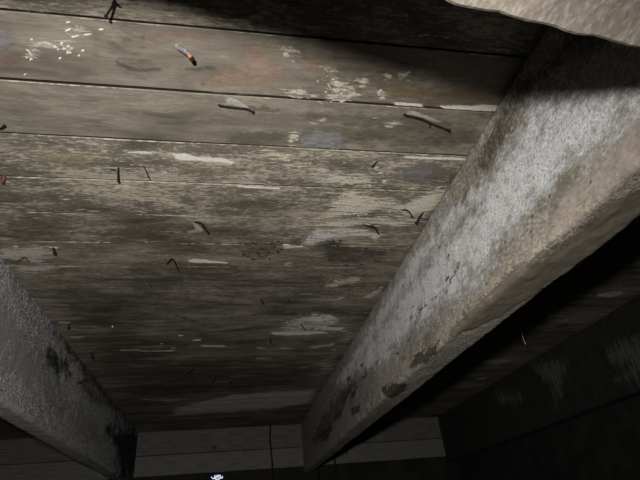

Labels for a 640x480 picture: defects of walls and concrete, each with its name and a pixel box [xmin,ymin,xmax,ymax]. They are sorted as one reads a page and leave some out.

peeling [19,21,92,60]
peeling [280,65,369,104]
leakage [300,78,640,449]
leakage [46,325,138,480]